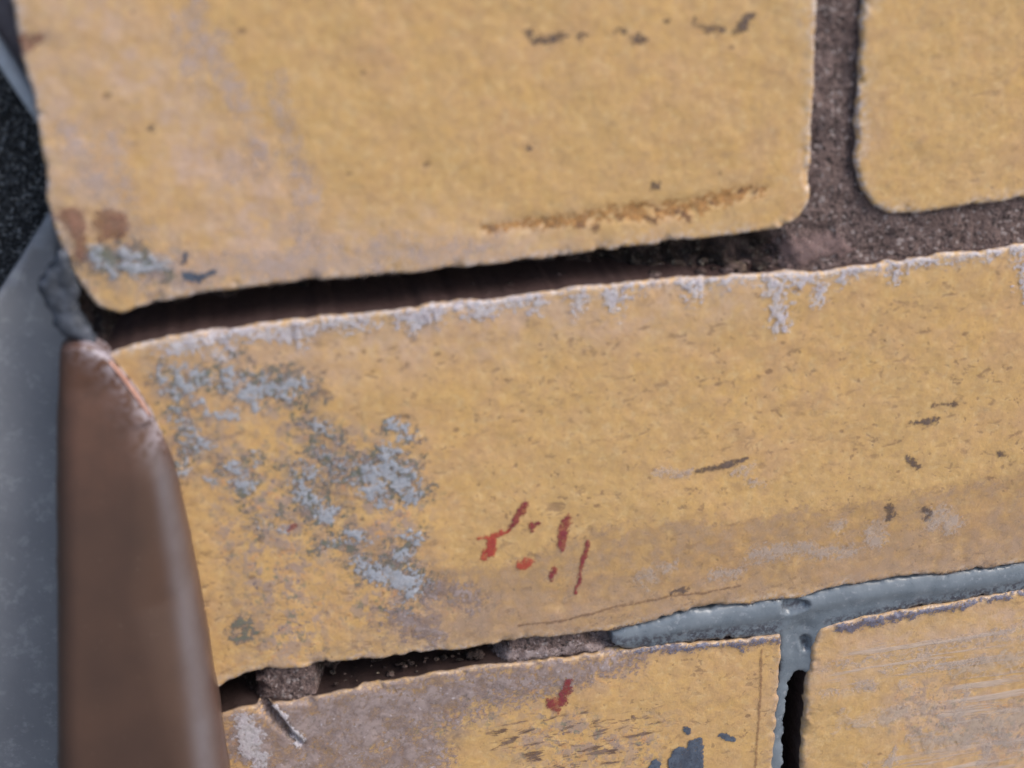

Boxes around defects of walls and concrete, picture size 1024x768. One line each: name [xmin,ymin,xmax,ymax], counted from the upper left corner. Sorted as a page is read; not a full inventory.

peeling [74,237,217,287]
peeling [145,342,439,619]